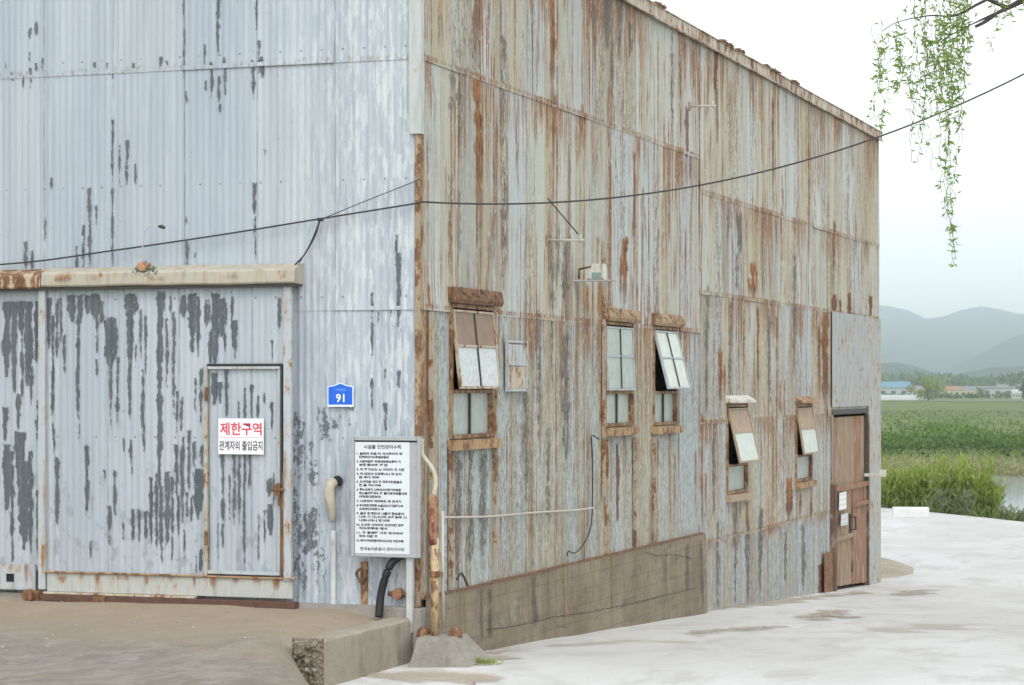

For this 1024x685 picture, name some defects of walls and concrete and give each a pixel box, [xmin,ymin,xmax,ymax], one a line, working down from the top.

peeling [203,0,227,113]
peeling [251,0,265,97]
corrosion [474,74,483,164]
peeling [75,187,98,268]
peeling [110,119,137,264]
corrosion [620,153,636,291]
corrosion [748,263,758,292]
corrosion [817,293,852,386]
peeling [0,291,275,573]
peeling [293,407,354,598]
corrosion [695,415,707,499]
crack [486,587,695,630]